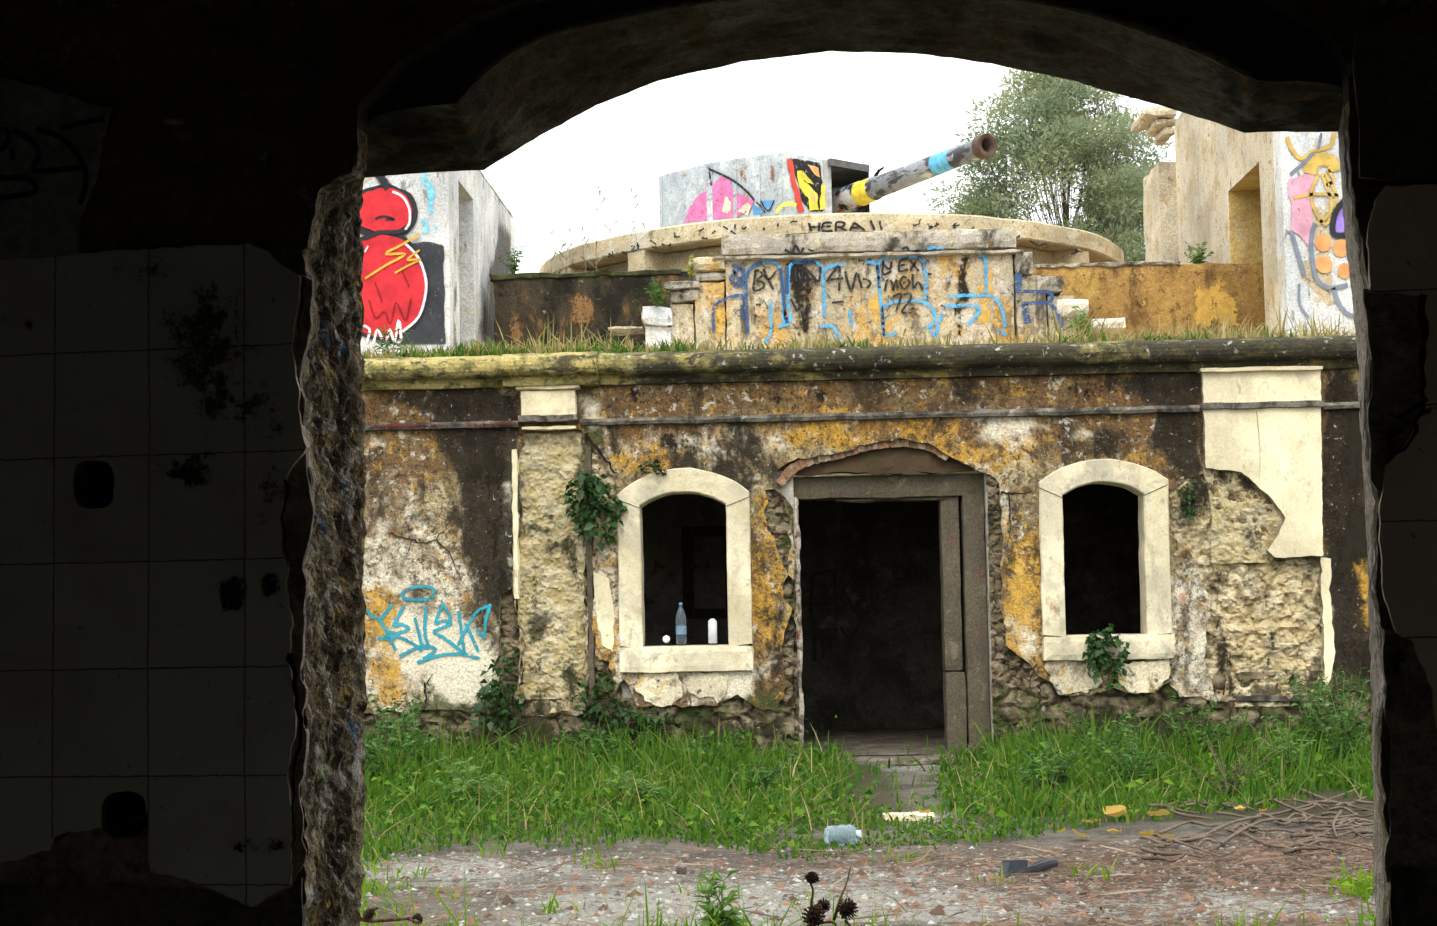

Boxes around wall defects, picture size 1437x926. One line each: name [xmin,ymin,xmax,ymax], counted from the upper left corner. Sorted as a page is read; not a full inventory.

mould [160,281,283,438]
leakage [437,392,512,599]
leakage [660,432,698,455]
leakage [1325,379,1368,601]
leakage [371,590,397,676]
leakage [1012,548,1033,630]
spalling [1170,463,1329,708]
leakage [1342,638,1371,687]